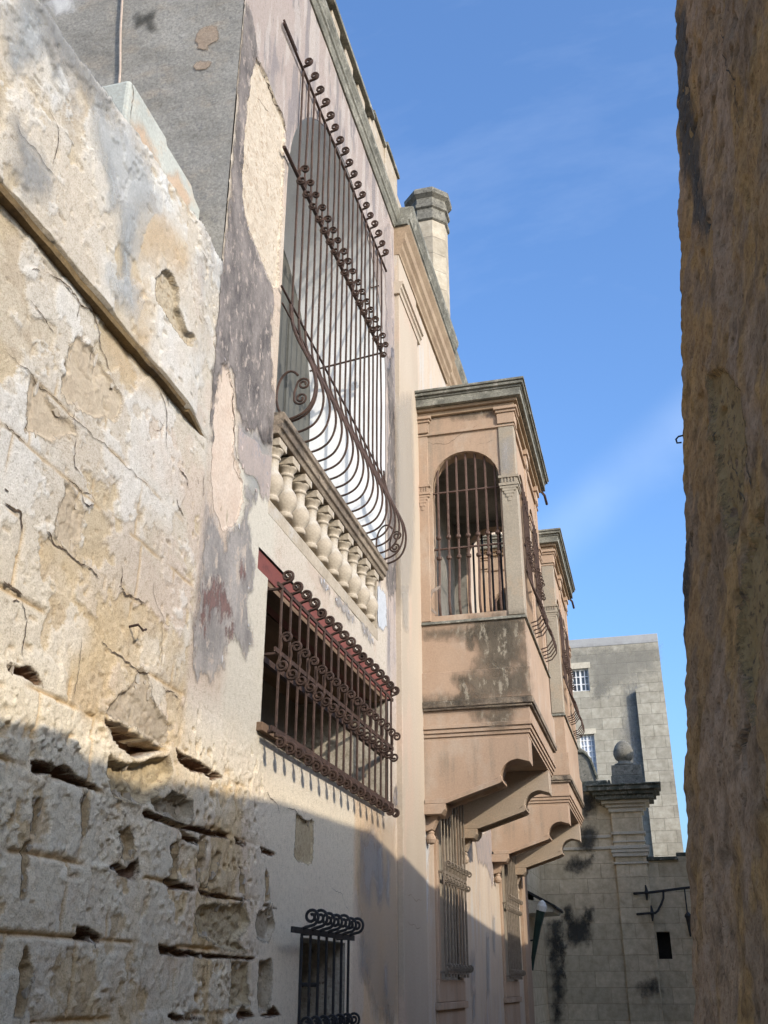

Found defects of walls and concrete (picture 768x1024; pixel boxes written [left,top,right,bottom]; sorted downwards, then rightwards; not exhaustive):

spalling [155,270,197,347]
peeling [193,2,286,682]
crack [4,348,204,514]
crack [5,488,23,532]
crack [4,581,27,655]
crack [49,532,179,710]
damp [422,615,529,726]
spalling [105,665,194,825]
spalling [294,814,314,865]
damp [566,793,597,872]
spalling [194,872,275,1013]
damp [547,906,592,1023]